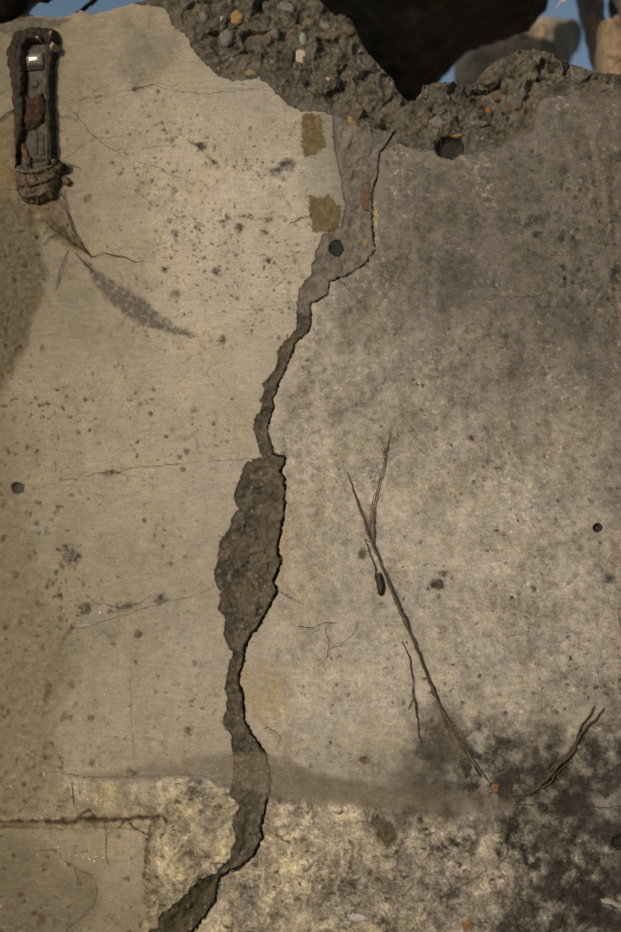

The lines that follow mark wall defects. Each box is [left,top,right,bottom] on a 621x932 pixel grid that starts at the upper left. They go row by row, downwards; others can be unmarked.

water stain [0,123,45,379]
crack [190,89,471,932]
spalling [134,0,621,932]
water stain [405,722,621,932]